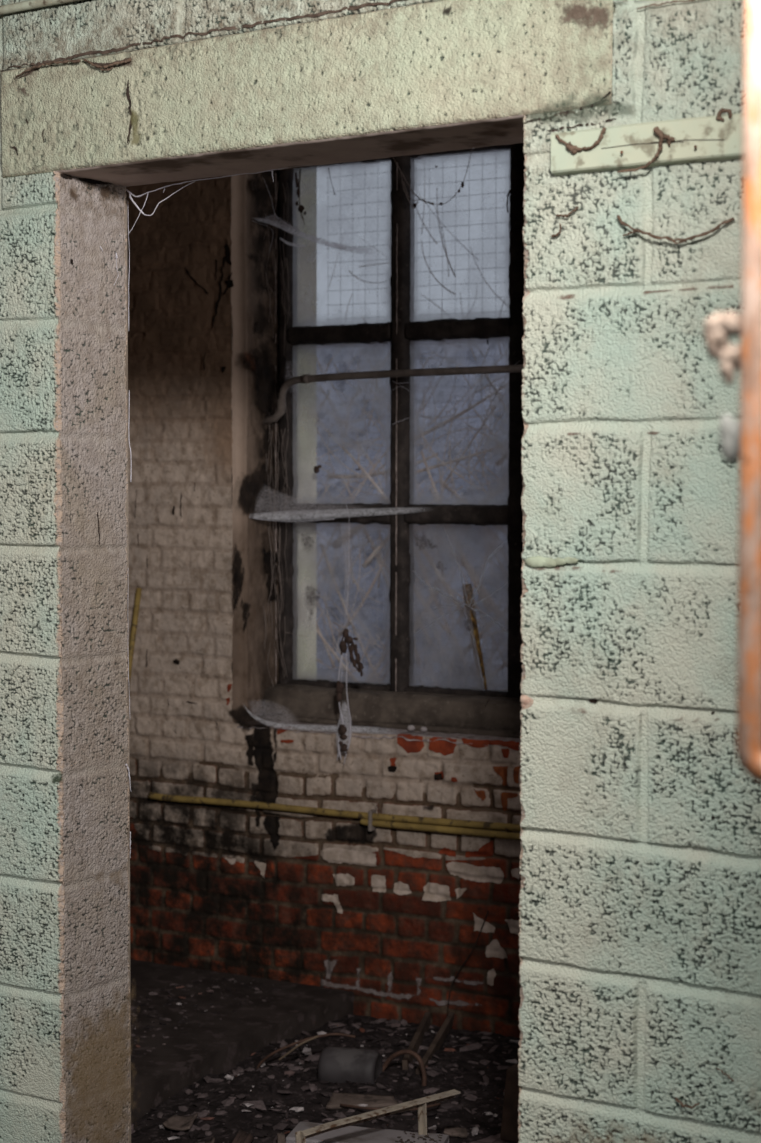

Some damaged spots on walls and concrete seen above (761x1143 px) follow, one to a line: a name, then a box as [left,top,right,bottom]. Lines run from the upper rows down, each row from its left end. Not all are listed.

crack [1,0,401,145]
crack [185,239,232,371]
leakage [232,544,250,631]
leakage [262,548,278,601]
peeling [390,734,520,766]
leakage [245,724,280,850]
peeling [434,771,458,782]
peeling [439,841,494,858]
peeling [333,874,355,886]
peeling [393,881,466,902]
peeling [505,919,520,934]
peeling [487,969,496,986]